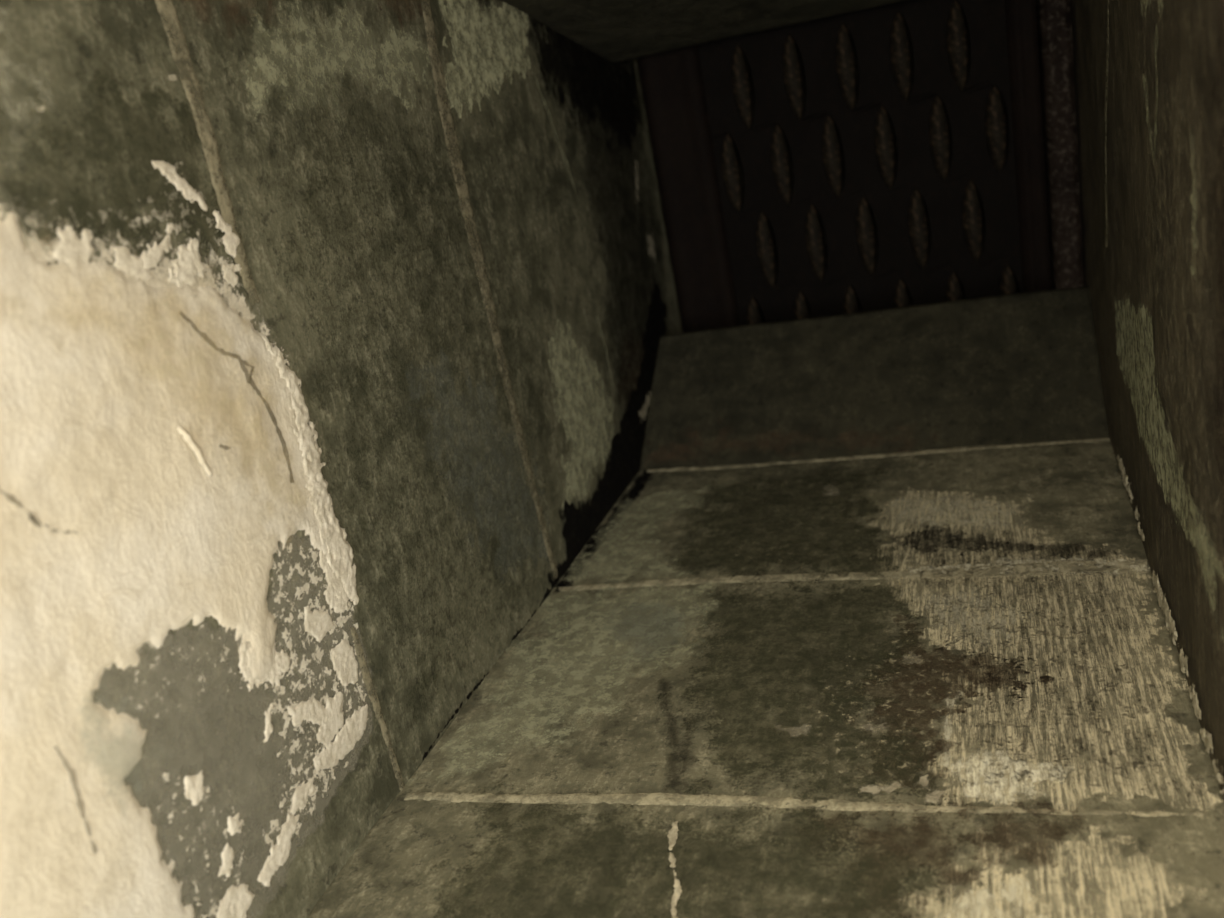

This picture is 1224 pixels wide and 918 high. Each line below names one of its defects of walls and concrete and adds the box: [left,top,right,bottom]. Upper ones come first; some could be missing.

damp [241,0,429,125]
damp [438,0,531,119]
flaking render [22,160,251,317]
damp [548,319,615,510]
damp [1115,54,1224,610]
flaking render [93,534,372,918]
damp [427,455,1224,918]
crack [667,821,682,918]